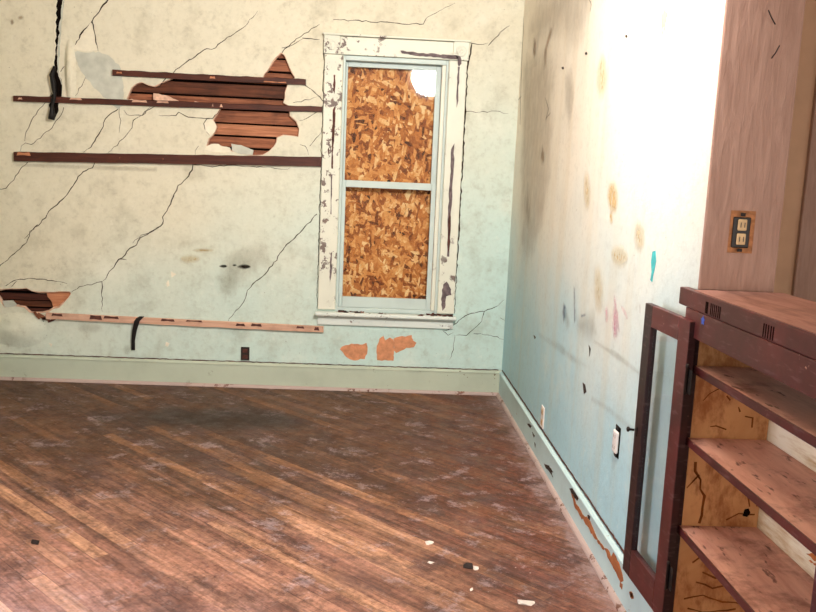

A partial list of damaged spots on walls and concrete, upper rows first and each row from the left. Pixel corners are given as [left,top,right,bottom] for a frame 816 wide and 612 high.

flaking render [74,23,299,155]
peeling [401,50,461,104]
peeling [320,106,336,200]
flaking render [0,288,71,323]
crack [0,0,624,554]
peeling [340,335,416,361]
peeling [441,282,451,311]
peeling [570,488,634,599]